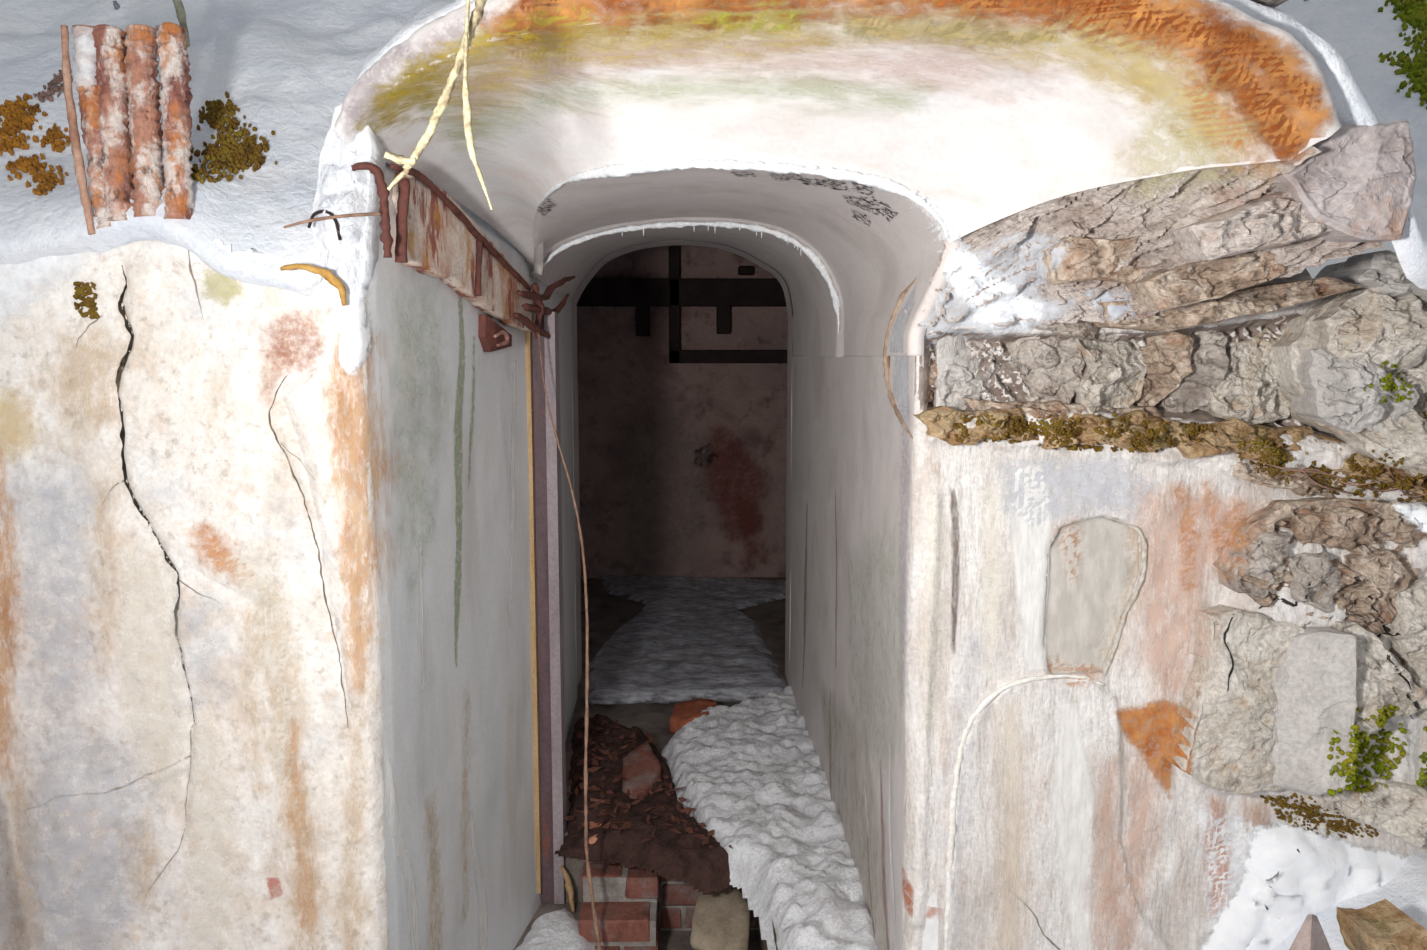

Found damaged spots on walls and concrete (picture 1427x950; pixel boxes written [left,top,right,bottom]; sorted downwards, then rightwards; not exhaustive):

crack [188,250,203,316]
crack [27,266,223,898]
crack [268,376,348,726]
corrosion [333,358,386,690]